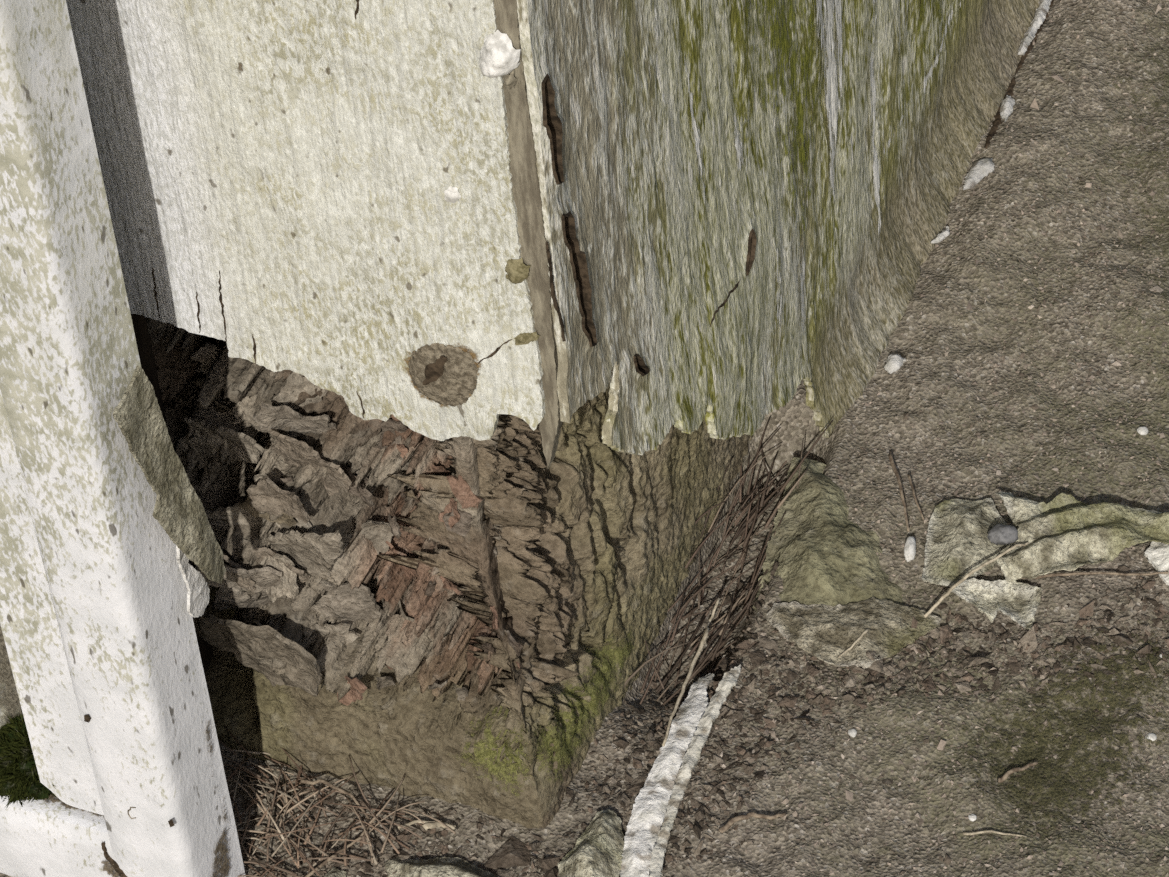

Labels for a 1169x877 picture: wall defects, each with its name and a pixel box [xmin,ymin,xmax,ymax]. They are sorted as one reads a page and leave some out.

damp [900,0,961,92]
crack [541,74,564,185]
damp [684,52,706,199]
damp [734,0,853,334]
damp [870,0,890,233]
crack [545,211,597,347]
crack [710,228,757,327]
spalling [404,343,481,407]
spalling [112,365,416,697]
spalling [432,464,483,536]
spalling [482,606,523,669]
damp [461,634,633,793]